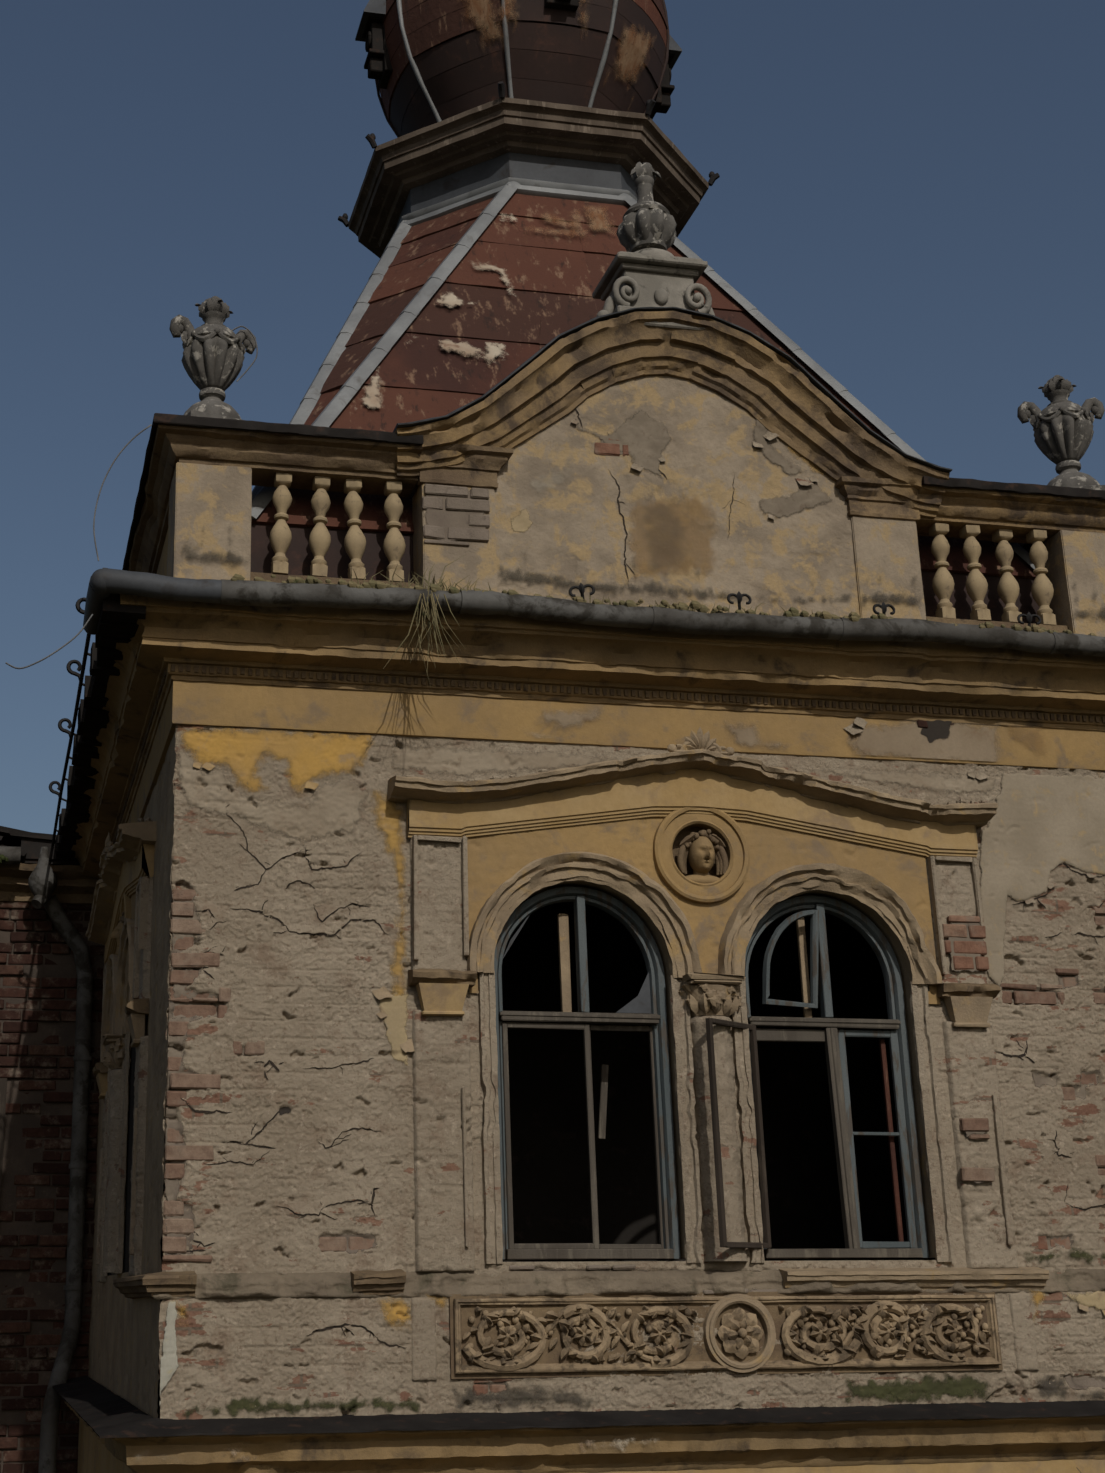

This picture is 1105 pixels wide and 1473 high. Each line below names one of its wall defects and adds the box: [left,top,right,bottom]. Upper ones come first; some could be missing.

peeling [437,293,473,308]
peeling [440,340,505,360]
peeling [473,263,512,292]
crack [575,408,635,586]
flaking render [752,418,832,520]
crack [176,785,392,979]
peeling [178,728,415,1065]
flaking render [778,717,1105,1005]
flaking render [162,889,231,1262]
crack [181,1018,391,1165]
crack [275,1188,384,1220]
crack [304,1313,407,1348]